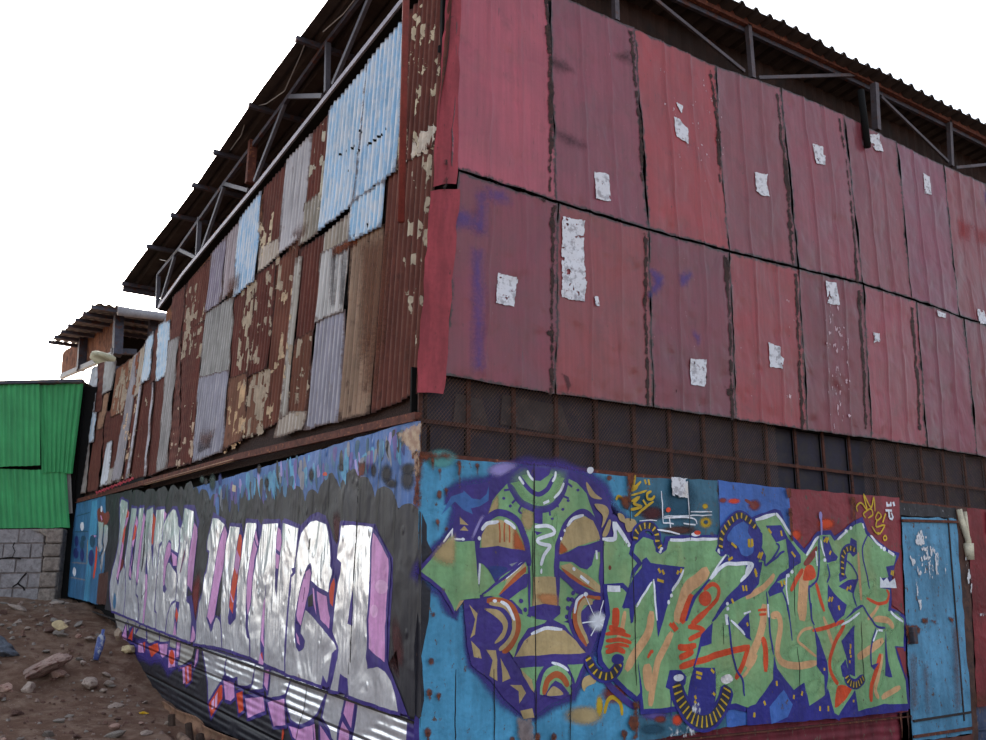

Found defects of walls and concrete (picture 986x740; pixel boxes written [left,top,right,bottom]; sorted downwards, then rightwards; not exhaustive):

peeling [408,3,440,116]
peeling [396,123,436,247]
rust [332,236,358,257]
peeling [405,291,423,315]
peeling [224,212,312,453]
rust [413,452,461,508]
rust [619,473,635,509]
rust [785,488,793,541]